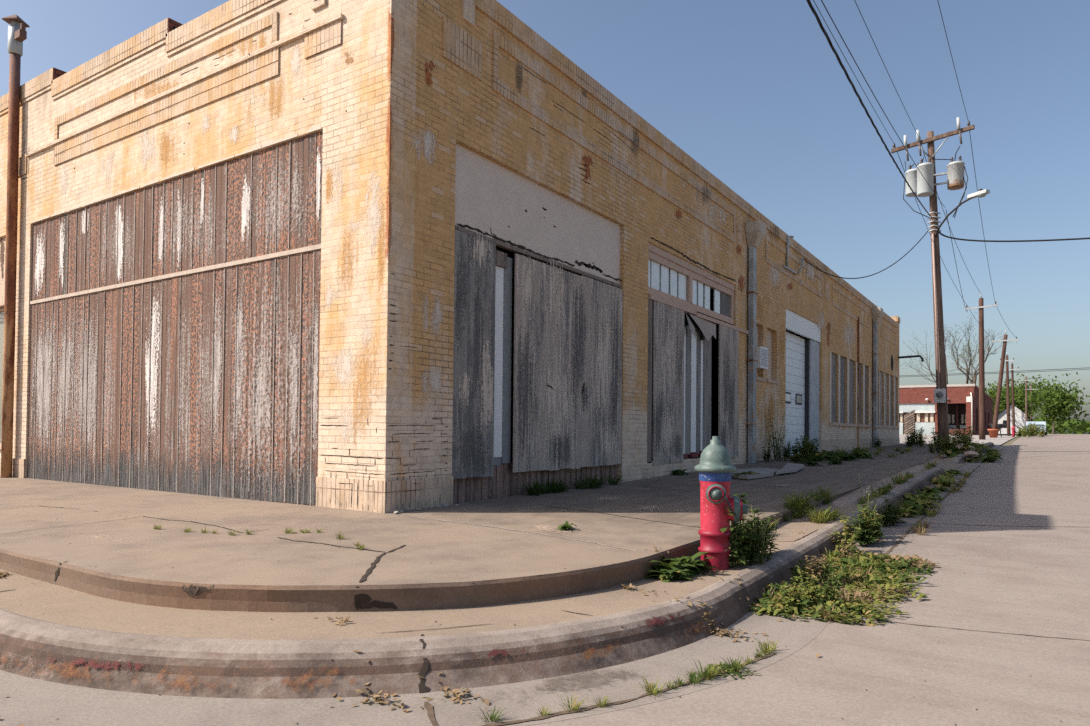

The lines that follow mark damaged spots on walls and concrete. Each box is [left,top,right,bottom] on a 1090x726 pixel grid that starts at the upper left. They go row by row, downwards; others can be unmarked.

corrosion [387,2,395,81]
corrosion [424,61,435,86]
corrosion [385,95,393,259]